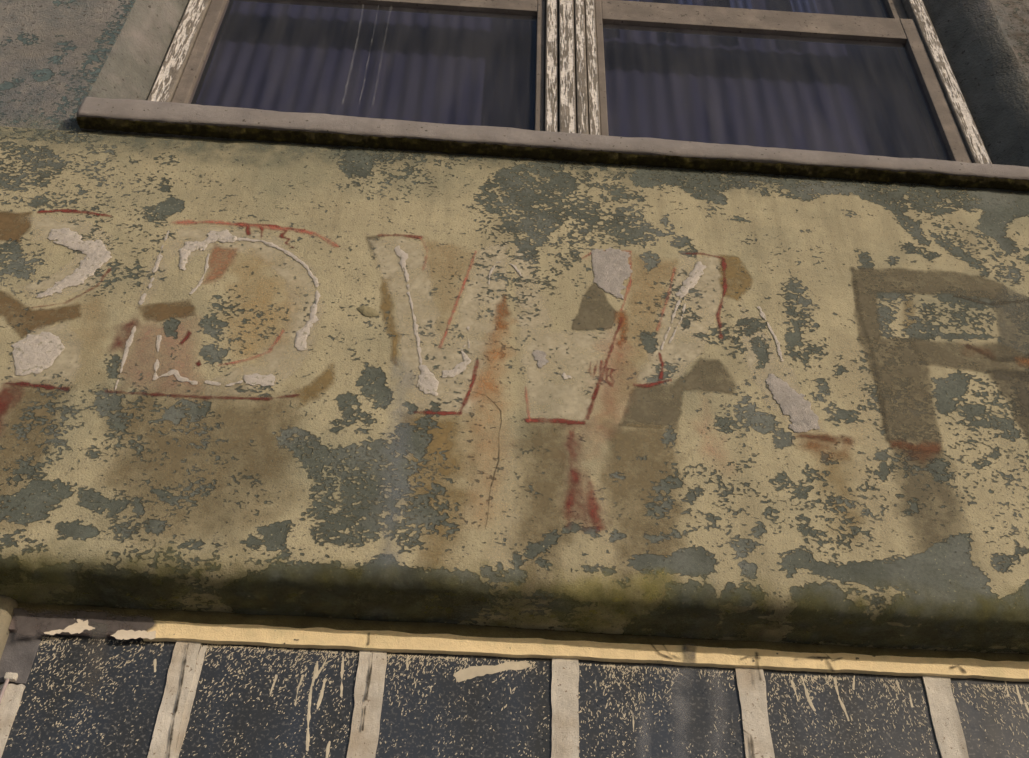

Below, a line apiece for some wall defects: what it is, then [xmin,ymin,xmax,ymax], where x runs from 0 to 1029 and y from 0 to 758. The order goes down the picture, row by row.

peeling [0,0,269,306]
peeling [910,0,992,164]
peeling [0,146,1029,654]